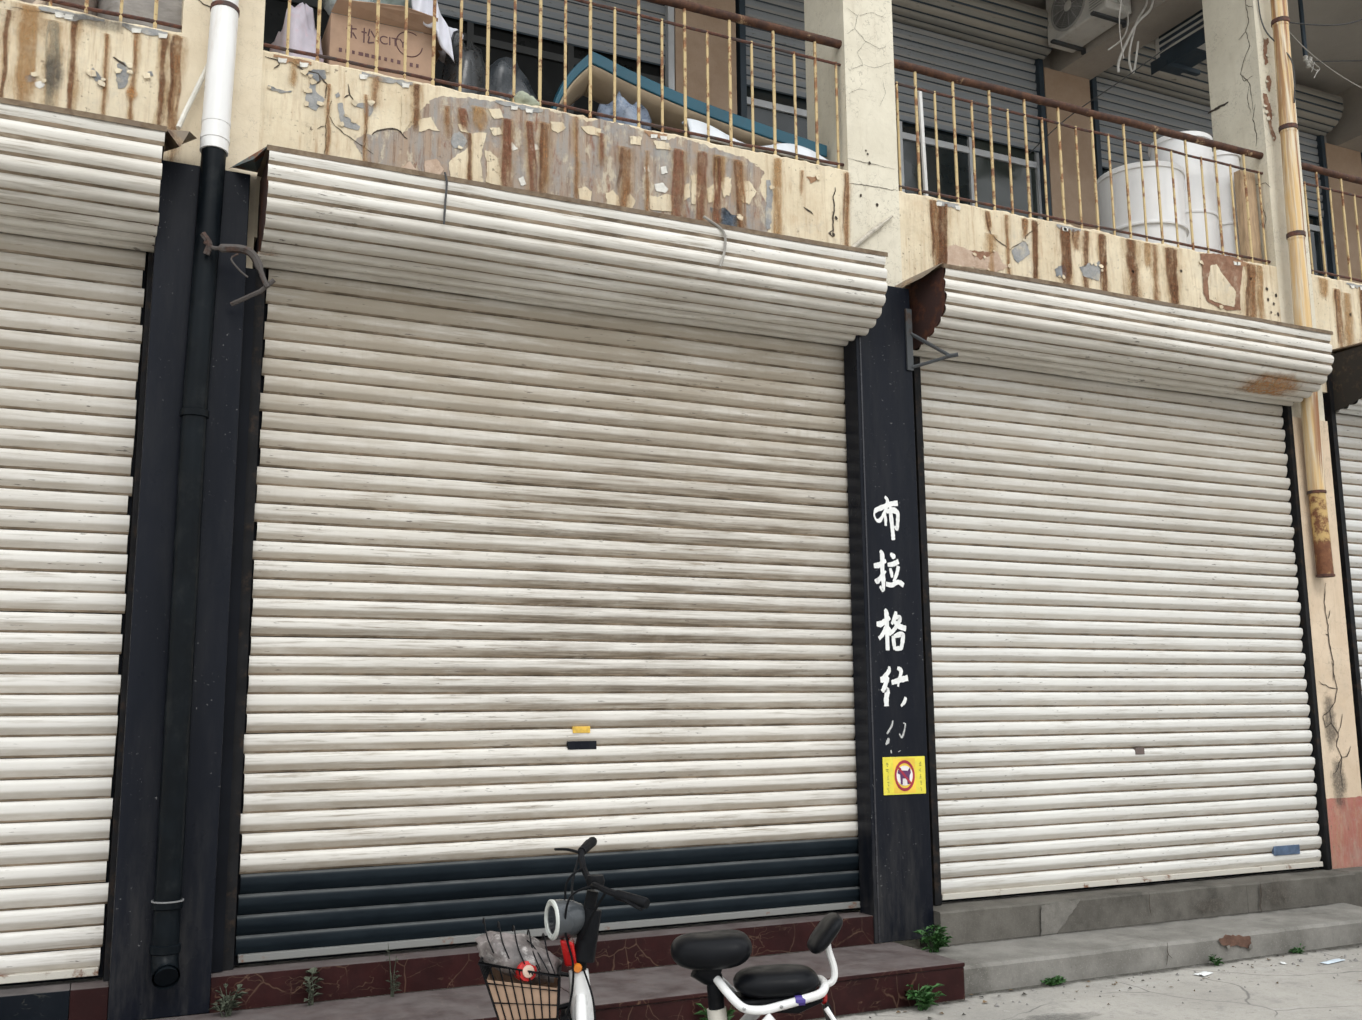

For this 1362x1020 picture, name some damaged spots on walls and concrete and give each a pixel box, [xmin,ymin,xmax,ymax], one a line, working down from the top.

rust [67,20,81,109]
rust [158,35,181,130]
crack [850,11,887,102]
crack [1208,0,1257,143]
peeling [267,54,774,232]
rust [502,118,548,191]
rust [671,148,746,228]
rust [930,199,948,265]
rust [986,212,1038,279]
rust [1061,227,1107,291]
rust [1127,239,1178,304]
crack [1319,583,1351,787]